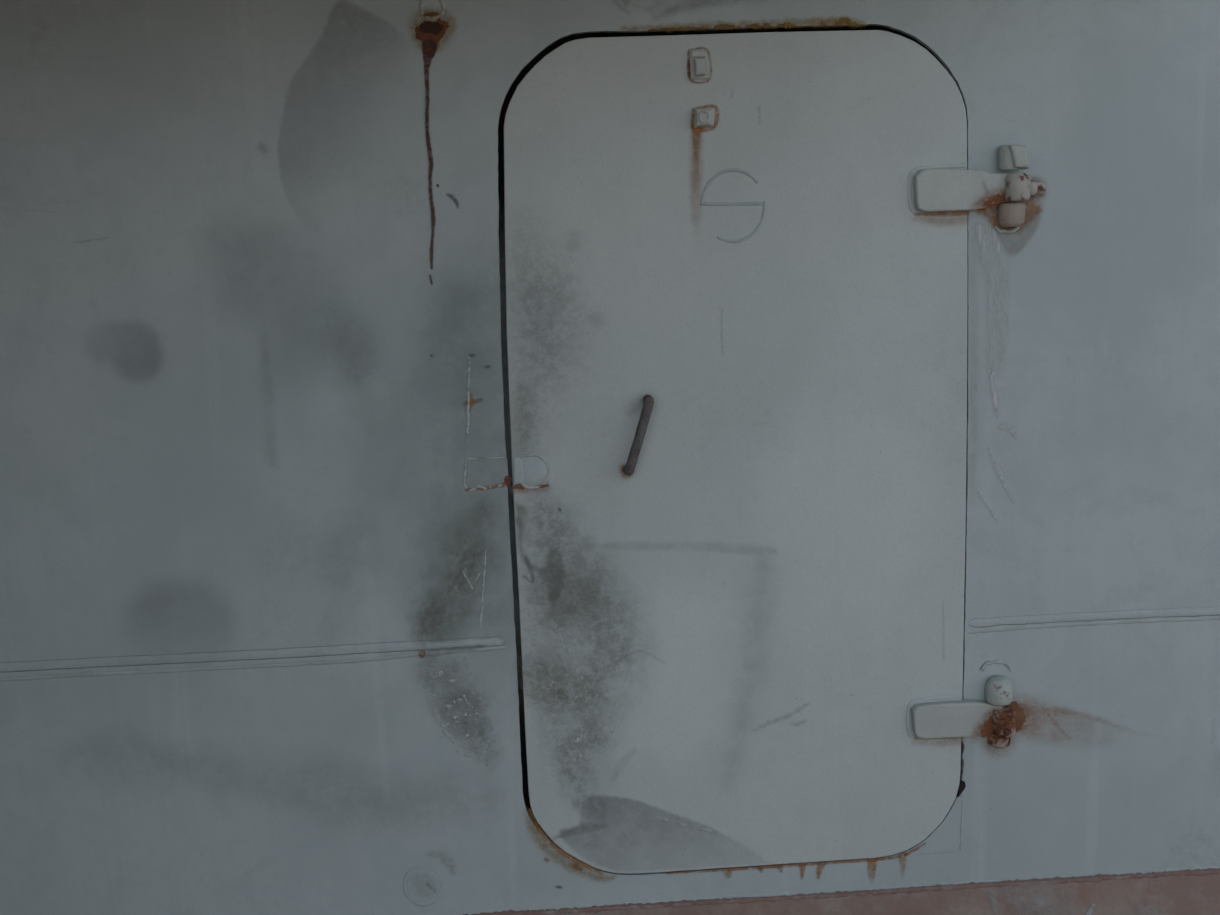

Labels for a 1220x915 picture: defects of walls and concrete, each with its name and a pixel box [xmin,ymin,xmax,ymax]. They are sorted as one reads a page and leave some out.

corrosion [633,17,860,31]
corrosion [415,11,451,284]
corrosion [691,105,719,158]
corrosion [918,191,1043,230]
corrosion [1003,701,1027,737]
corrosion [532,814,600,872]
corrosion [706,847,919,878]